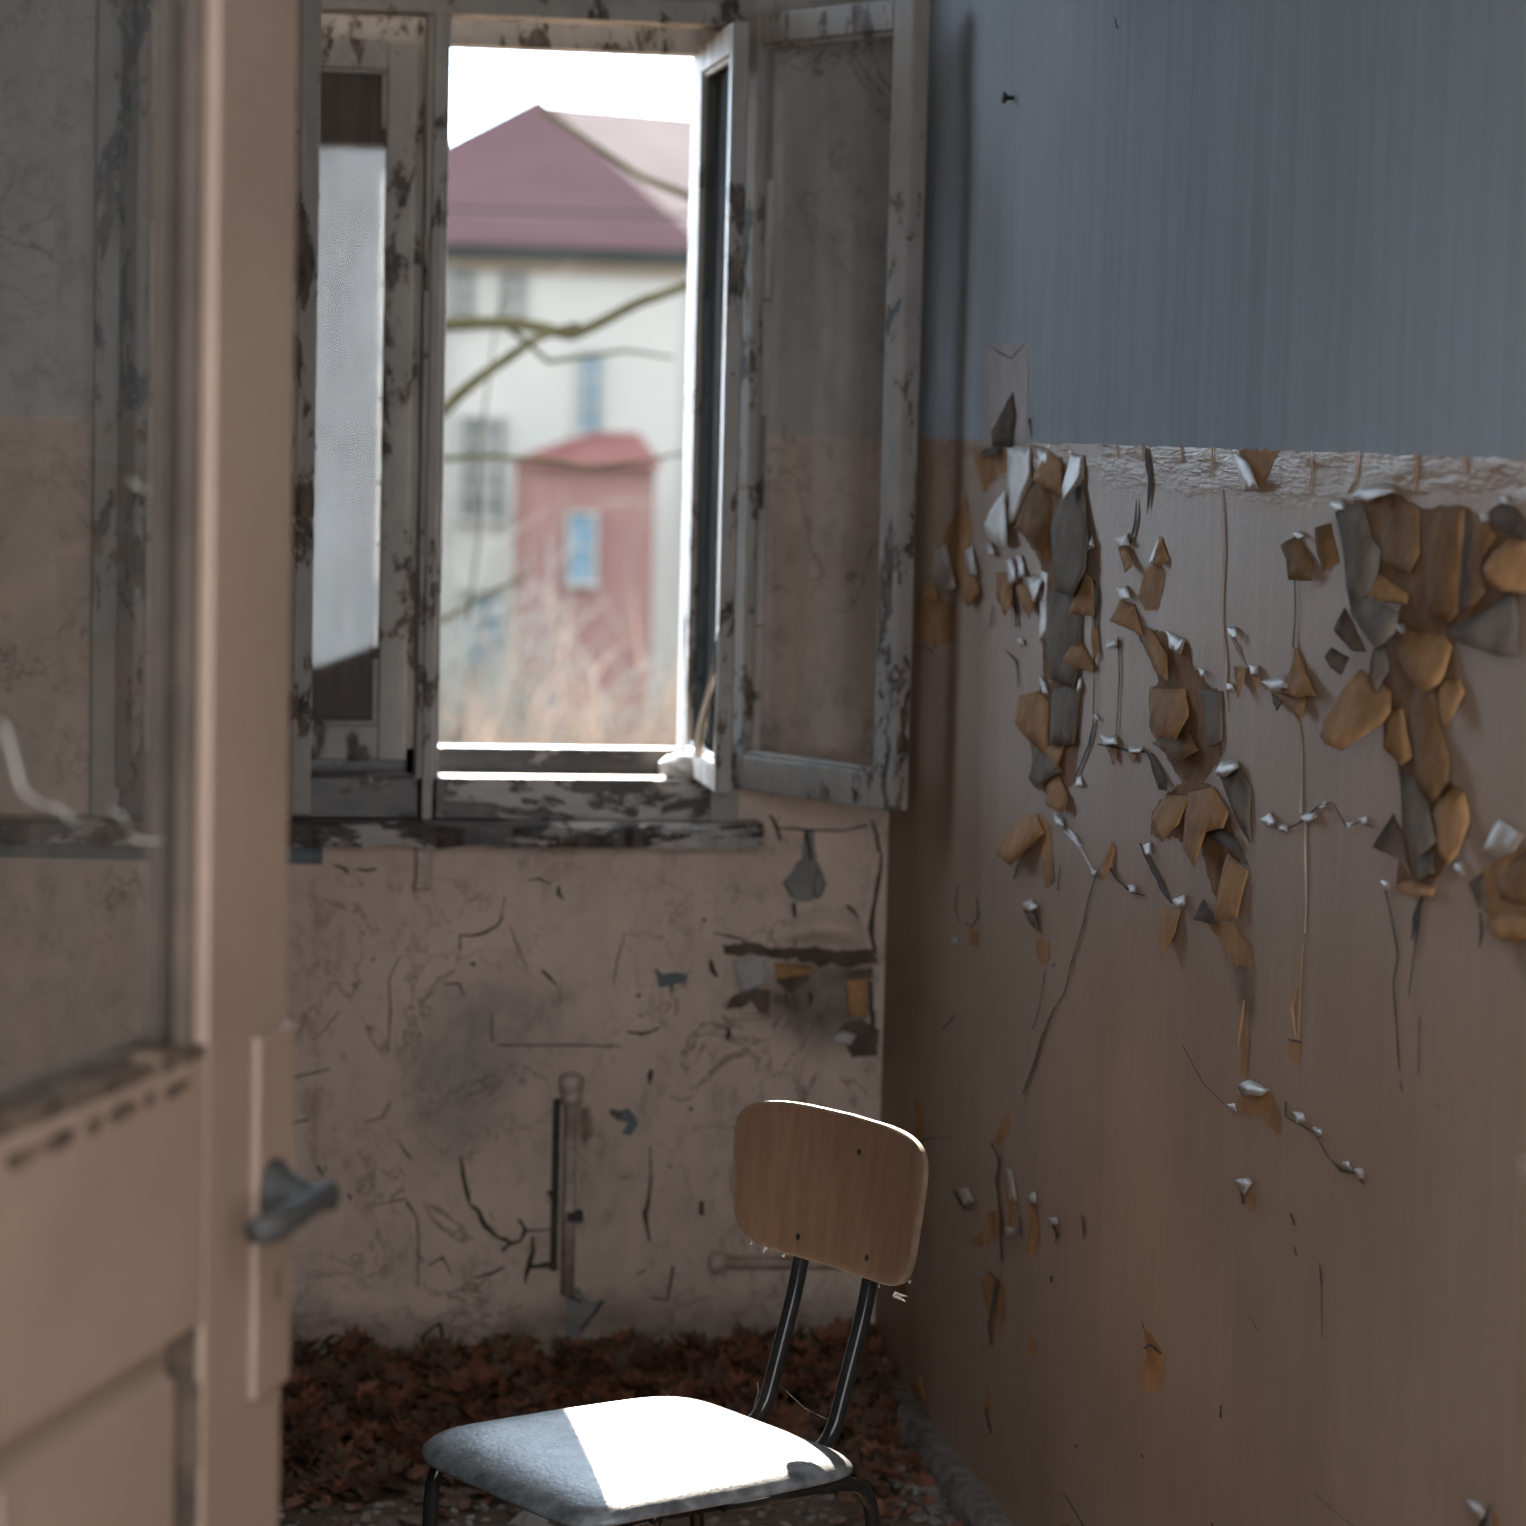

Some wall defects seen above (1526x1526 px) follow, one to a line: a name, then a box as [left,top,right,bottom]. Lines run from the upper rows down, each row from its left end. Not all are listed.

peeling [1234,447,1278,493]
peeling [916,341,1254,969]
peeling [1280,482,1526,948]
peeling [782,831,827,919]
crack [769,814,883,955]
crack [294,956,401,1078]
crack [444,878,660,1047]
spalling [702,918,880,1058]
crack [317,1158,558,1288]
crack [636,1145,674,1301]
peeling [1464,1498,1499,1526]